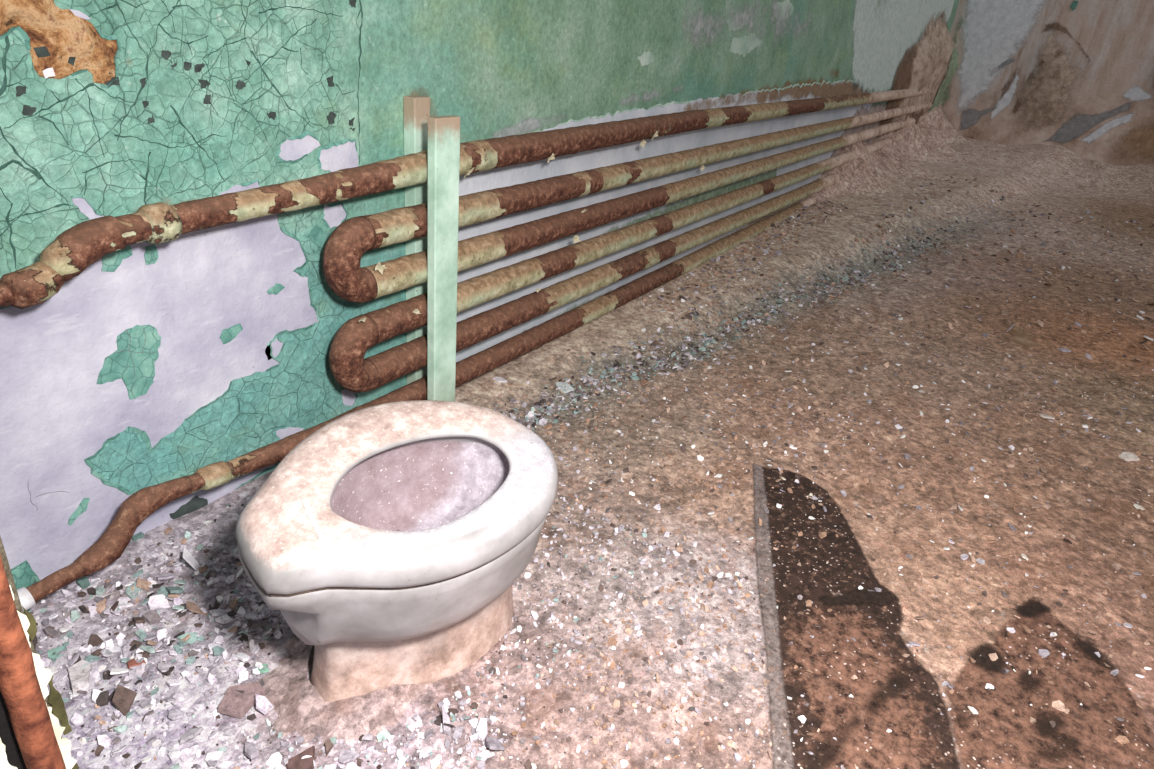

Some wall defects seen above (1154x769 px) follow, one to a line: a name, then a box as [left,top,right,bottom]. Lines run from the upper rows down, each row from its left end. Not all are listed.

peeling [70,194,103,220]
crack [0,0,363,270]
peeling [276,111,358,172]
peeling [457,0,1046,322]
rust [687,72,868,111]
peeling [1043,86,1151,144]
peeling [456,224,747,362]
peeling [0,201,348,769]